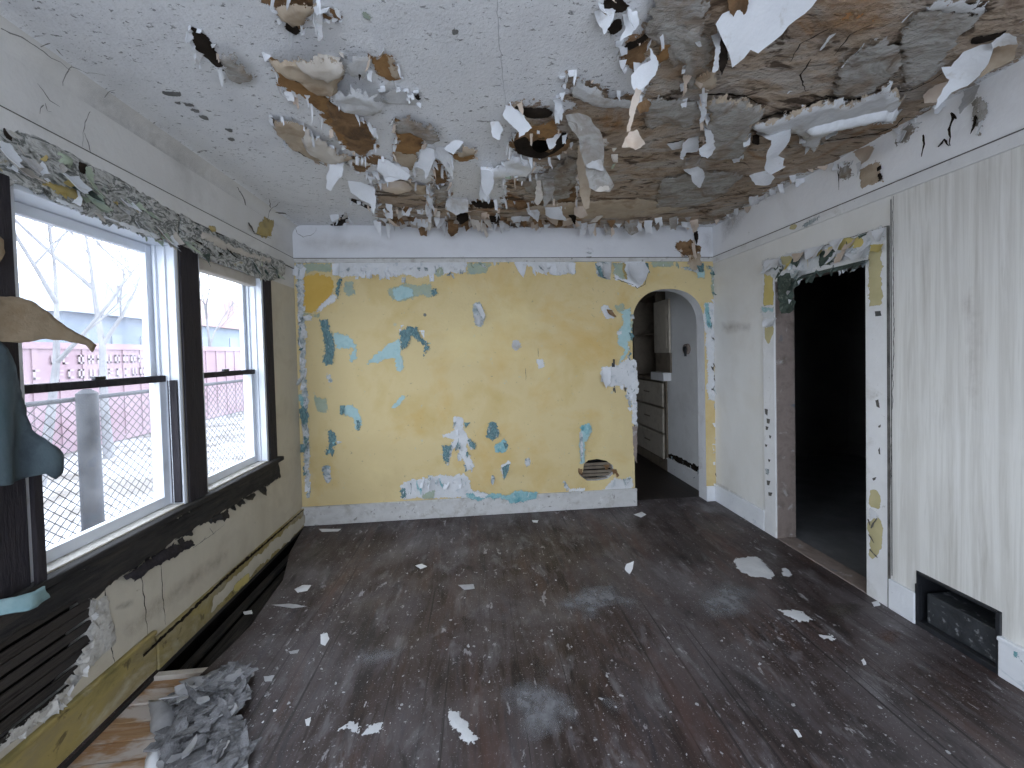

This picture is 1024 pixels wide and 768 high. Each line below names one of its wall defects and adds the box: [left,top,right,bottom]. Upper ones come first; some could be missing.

spalling [162,91,208,120]
peeling [261,0,1024,408]
peeling [0,128,576,504]
flaking render [600,303,639,462]
spalling [0,607,70,653]
crack [143,510,303,657]
peeling [208,486,267,524]
peeling [211,515,305,613]
spalling [563,423,633,492]
peeling [668,454,699,478]
peeling [867,477,883,559]
peeling [0,633,94,739]